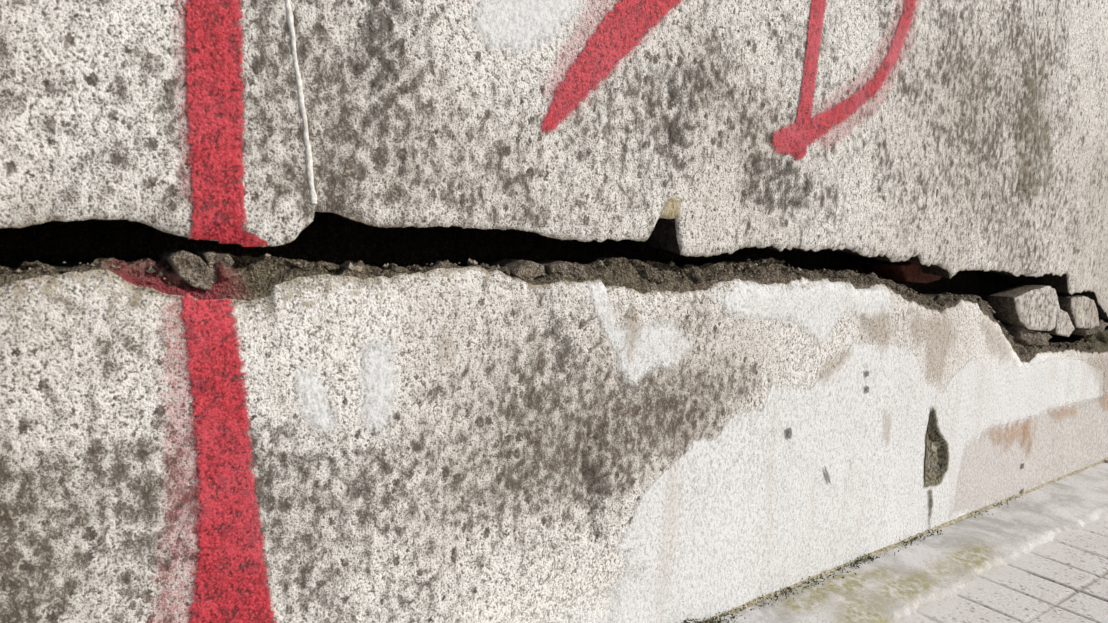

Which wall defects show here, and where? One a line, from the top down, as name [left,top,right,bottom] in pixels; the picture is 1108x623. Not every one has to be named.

water stain [1014,56,1059,202]
crack [0,211,1108,363]
water stain [539,312,585,393]
peeling [589,281,693,386]
peeling [718,279,892,344]
water stain [577,407,615,539]
peeling [599,342,1108,623]